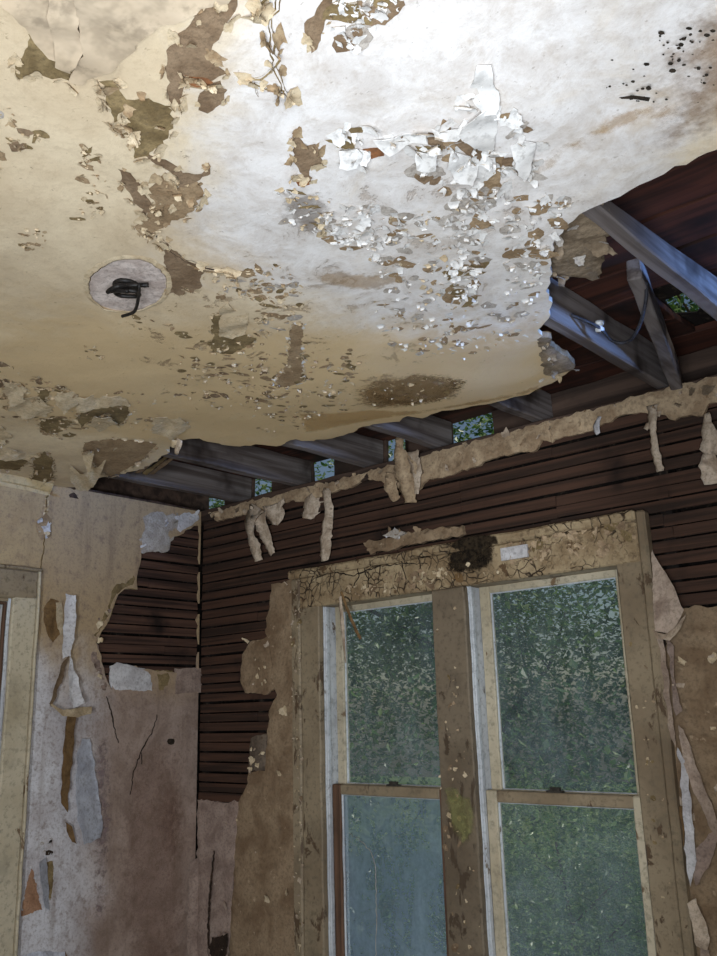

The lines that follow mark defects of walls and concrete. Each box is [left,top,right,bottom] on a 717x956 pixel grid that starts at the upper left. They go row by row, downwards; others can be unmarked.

mould [606,63,668,103]
mould [658,27,715,85]
peeling [0,0,466,491]
peeling [274,65,617,383]
damp [359,375,460,408]
crack [309,550,427,588]
peeling [347,562,470,596]
peeling [483,522,636,574]
flaking render [91,575,137,690]
crack [130,715,157,794]
peeling [247,747,265,773]
peeling [279,687,304,826]